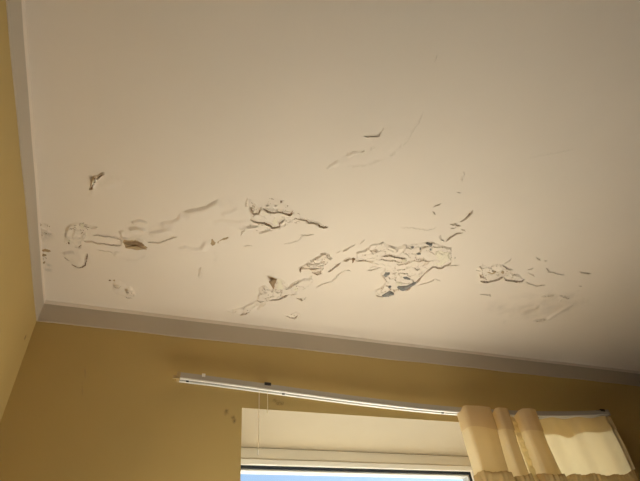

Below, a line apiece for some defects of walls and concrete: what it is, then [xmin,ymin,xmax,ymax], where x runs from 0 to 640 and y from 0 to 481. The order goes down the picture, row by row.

peeling [89,172,105,190]
peeling [243,197,304,235]
crack [401,203,473,242]
flaking render [120,237,149,250]
peeling [227,253,333,316]
peeling [356,242,453,298]
peeling [476,258,525,283]
crack [525,257,591,287]